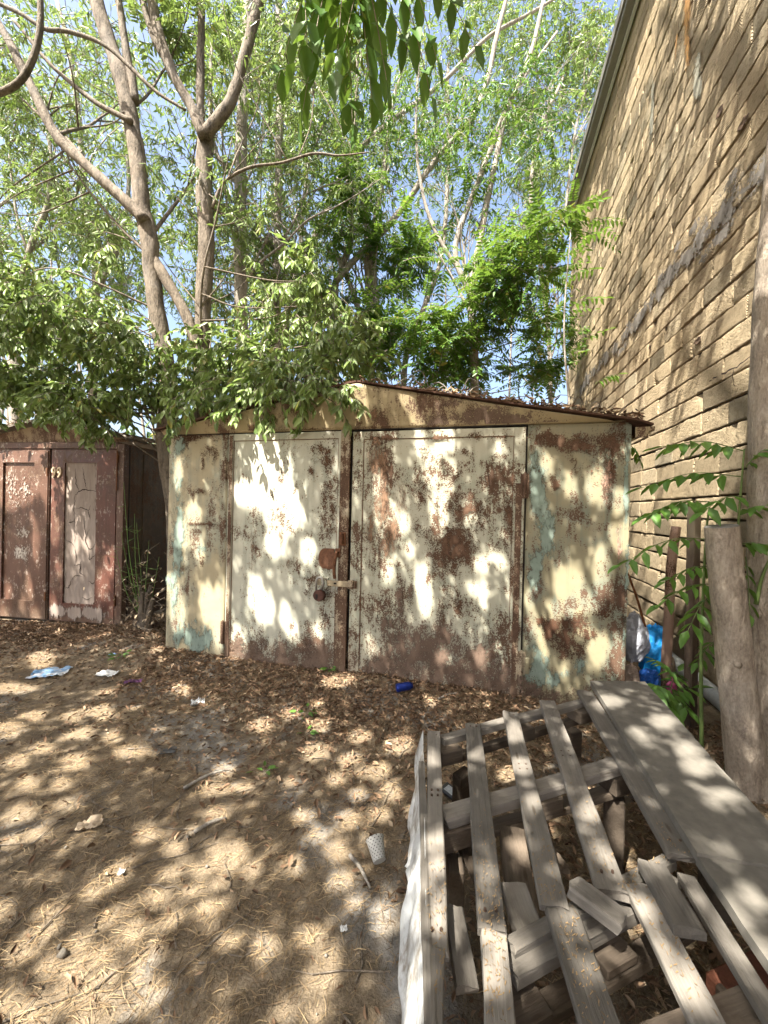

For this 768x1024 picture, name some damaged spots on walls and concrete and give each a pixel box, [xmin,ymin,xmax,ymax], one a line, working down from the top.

rust [173,434,229,470]
peeling [3,524,30,561]
crack [63,469,96,600]
rust [229,399,626,705]